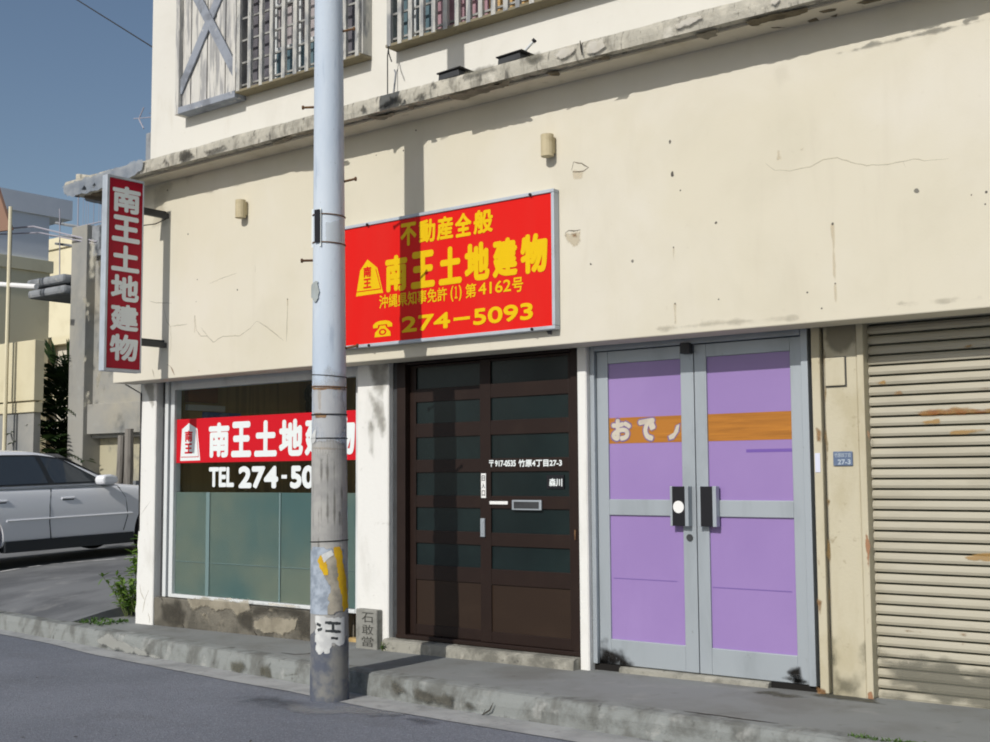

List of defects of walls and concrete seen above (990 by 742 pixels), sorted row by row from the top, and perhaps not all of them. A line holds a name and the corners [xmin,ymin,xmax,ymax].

spalling [746,0,837,28]
water stain [373,364,387,388]
corrosion [920,408,990,423]
corrosion [966,553,990,561]
flaking render [187,597,249,616]
flaking render [254,603,298,635]